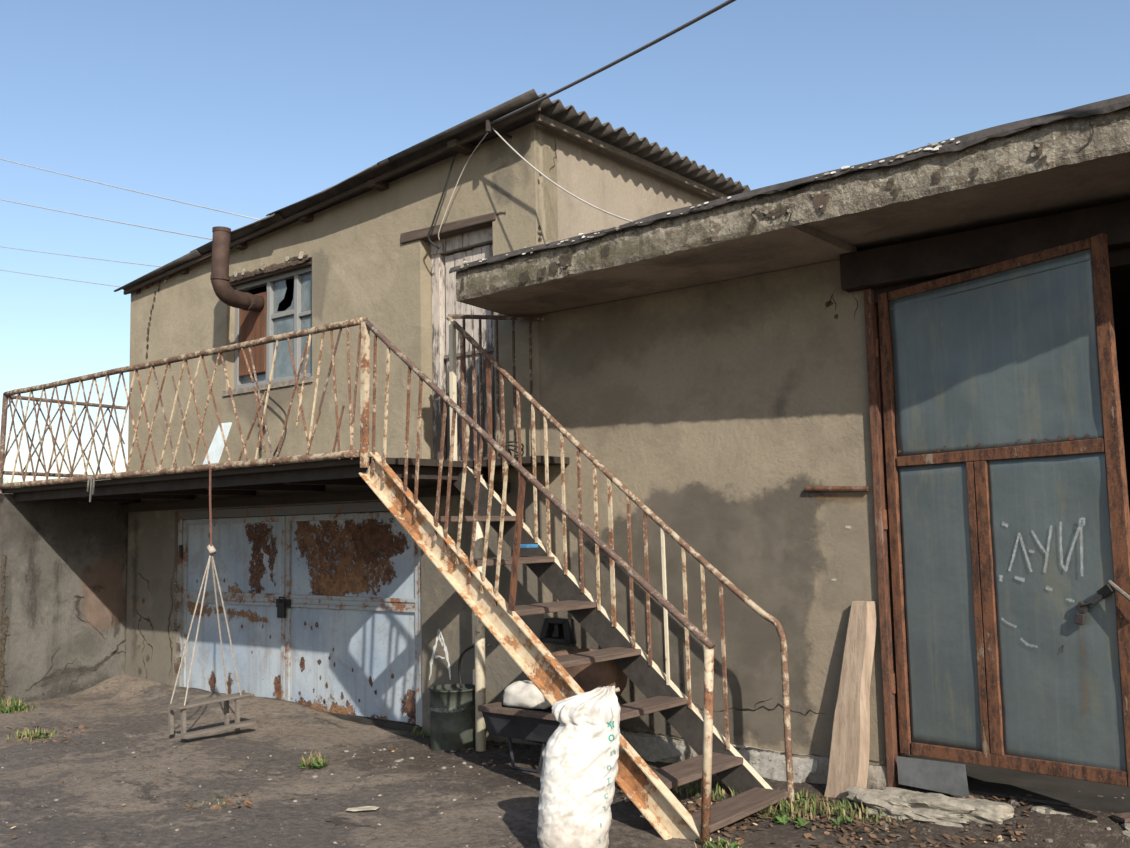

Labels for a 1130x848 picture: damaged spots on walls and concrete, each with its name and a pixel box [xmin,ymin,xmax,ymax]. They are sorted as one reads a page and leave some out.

peeling [815,138,961,178]
spalling [1030,142,1049,165]
spalling [886,177,901,198]
spalling [749,205,790,232]
corrosion [187,523,278,638]
corrosion [294,512,410,610]
crack [25,573,154,691]
water stain [552,611,602,651]
water stain [568,477,826,745]
corrosion [273,647,361,716]
corrosion [400,687,416,724]
crack [695,700,824,716]